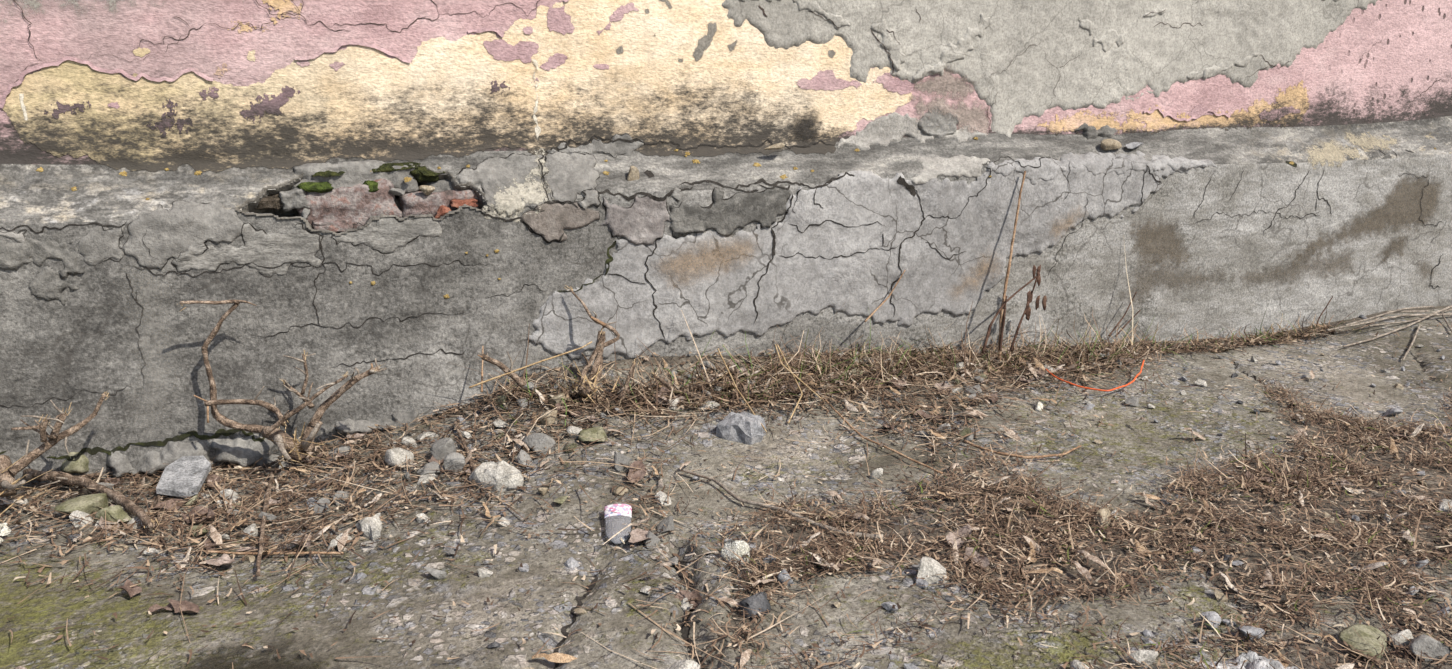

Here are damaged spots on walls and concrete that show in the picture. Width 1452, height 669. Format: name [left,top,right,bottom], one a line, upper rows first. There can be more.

peeling [0,0,914,245]
water stain [532,59,541,138]
water stain [794,118,815,141]
peeling [1037,80,1310,136]
crack [481,44,1088,323]
crack [1139,165,1162,208]
water stain [1246,177,1440,280]
crack [0,201,665,408]